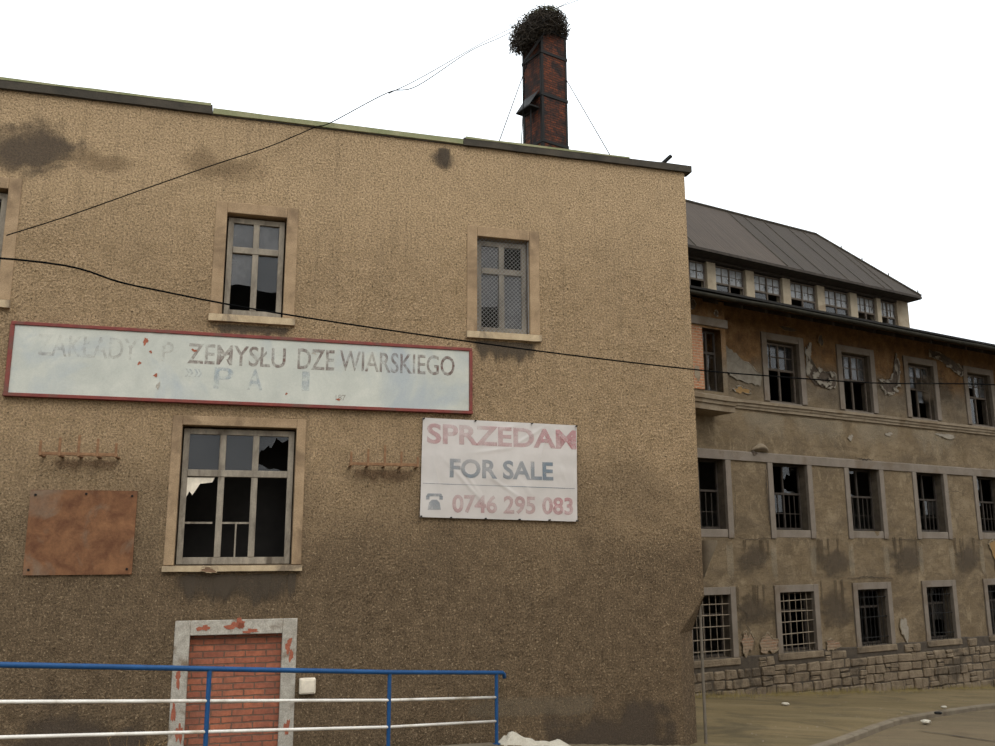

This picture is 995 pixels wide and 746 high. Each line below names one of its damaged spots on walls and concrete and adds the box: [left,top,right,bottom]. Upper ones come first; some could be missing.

leakage [0,125,75,172]
leakage [435,148,451,167]
peeling [805,342,837,389]
peeling [879,353,901,396]
flaking render [742,629,779,658]